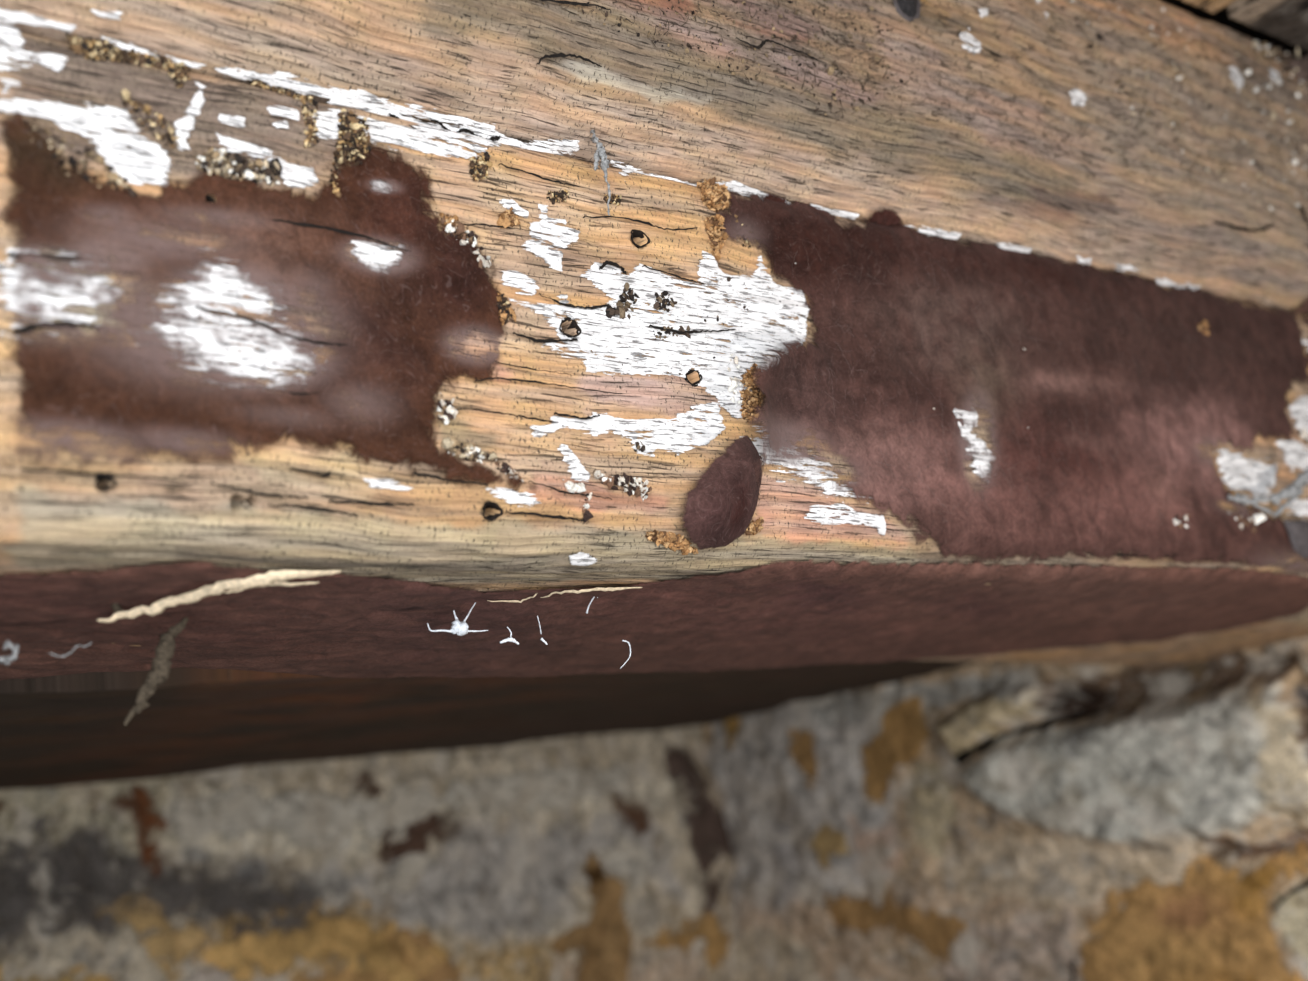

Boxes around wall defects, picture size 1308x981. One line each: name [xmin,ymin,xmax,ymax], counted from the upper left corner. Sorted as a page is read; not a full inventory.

peeling [0,9,580,188]
peeling [0,248,124,339]
peeling [151,248,319,388]
peeling [351,240,403,271]
peeling [499,198,580,271]
peeling [715,180,767,200]
peeling [905,225,962,240]
peeling [501,251,886,536]
peeling [1217,395,1308,503]
peeling [485,487,541,508]
spalling [1079,840,1308,981]
crack [1272,880,1308,911]